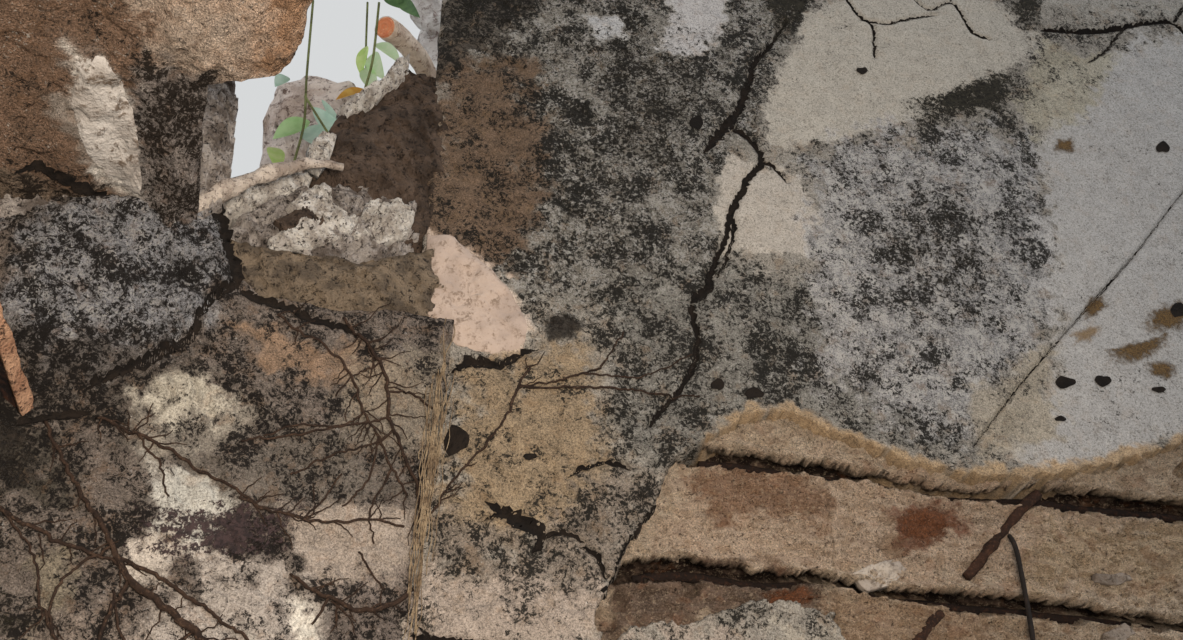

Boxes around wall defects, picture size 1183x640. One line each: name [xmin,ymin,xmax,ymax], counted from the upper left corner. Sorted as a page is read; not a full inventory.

crack [846,0,988,59]
crack [1040,7,1183,63]
crack [648,25,788,428]
crack [973,193,1183,448]
crack [567,459,629,478]
crack [481,490,661,600]
spalling [594,419,1183,640]
rust [897,505,958,546]